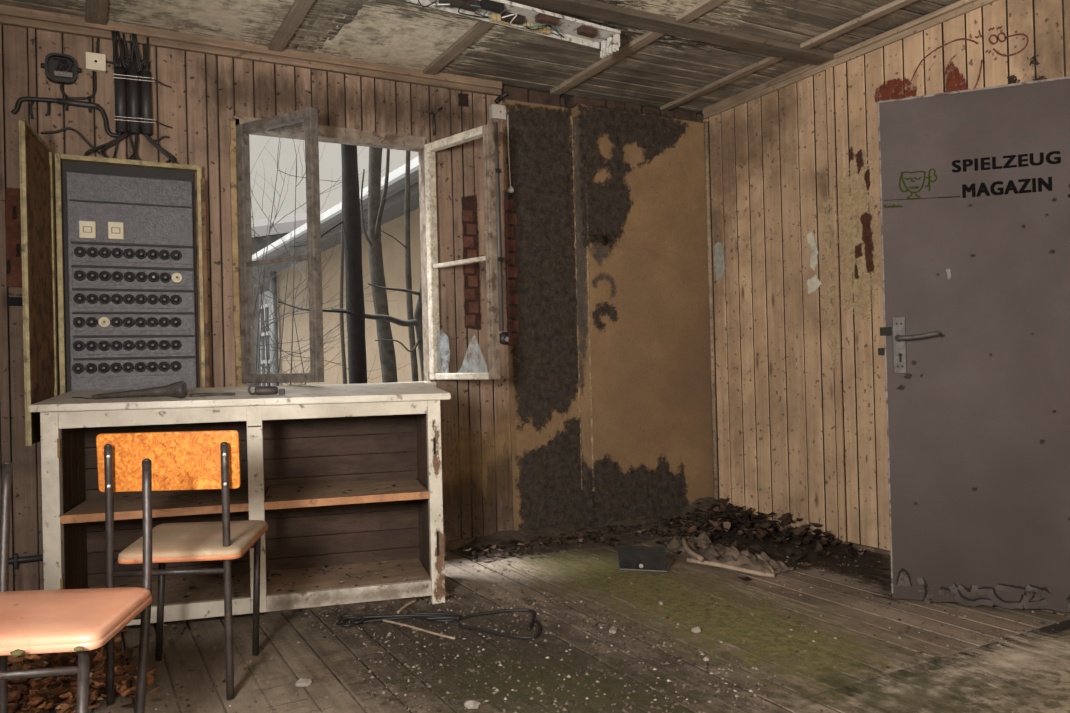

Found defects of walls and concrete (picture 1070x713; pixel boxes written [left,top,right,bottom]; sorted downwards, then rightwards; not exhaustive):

flaking render [504,191,519,346]
peeling [893,568,1053,609]